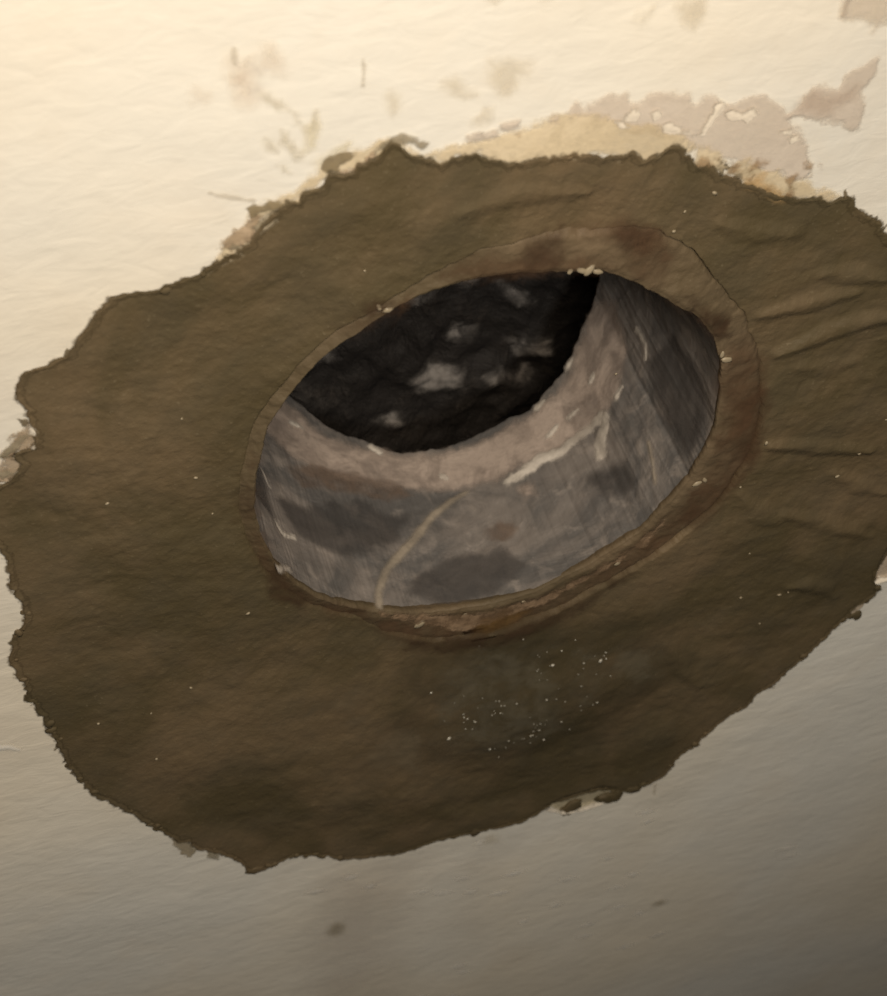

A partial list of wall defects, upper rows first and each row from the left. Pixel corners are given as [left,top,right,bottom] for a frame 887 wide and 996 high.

peeling [217,59,878,262]
damp [513,340,552,356]
damp [635,327,647,360]
damp [415,364,461,390]
damp [504,412,609,495]
spalling [874,556,887,584]